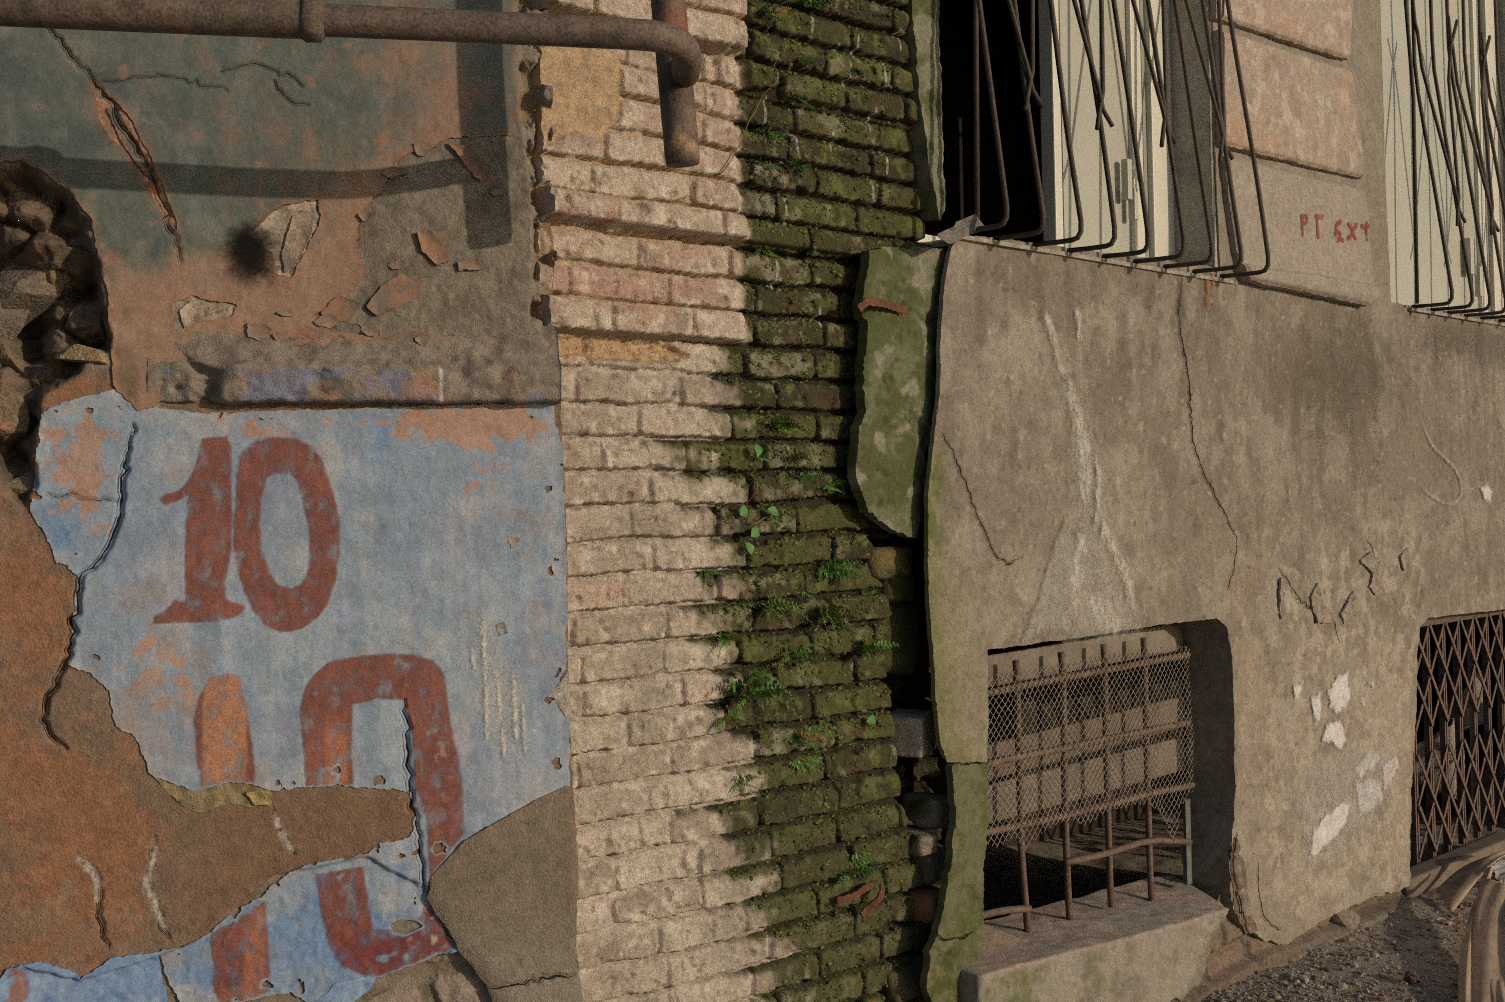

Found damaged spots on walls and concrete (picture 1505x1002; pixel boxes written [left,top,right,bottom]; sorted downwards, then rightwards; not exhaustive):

peeling [93,83,177,230]
crack [49,29,307,259]
spalling [171,136,533,346]
crack [943,434,1024,565]
efflorescence [1067,383,1133,602]
crack [1178,278,1238,590]
crack [41,425,135,749]
efflorescence [1071,534,1118,632]
crack [1279,569,1340,643]
spalling [153,776,272,812]
peeling [0,951,167,1002]
peeling [316,972,376,1002]